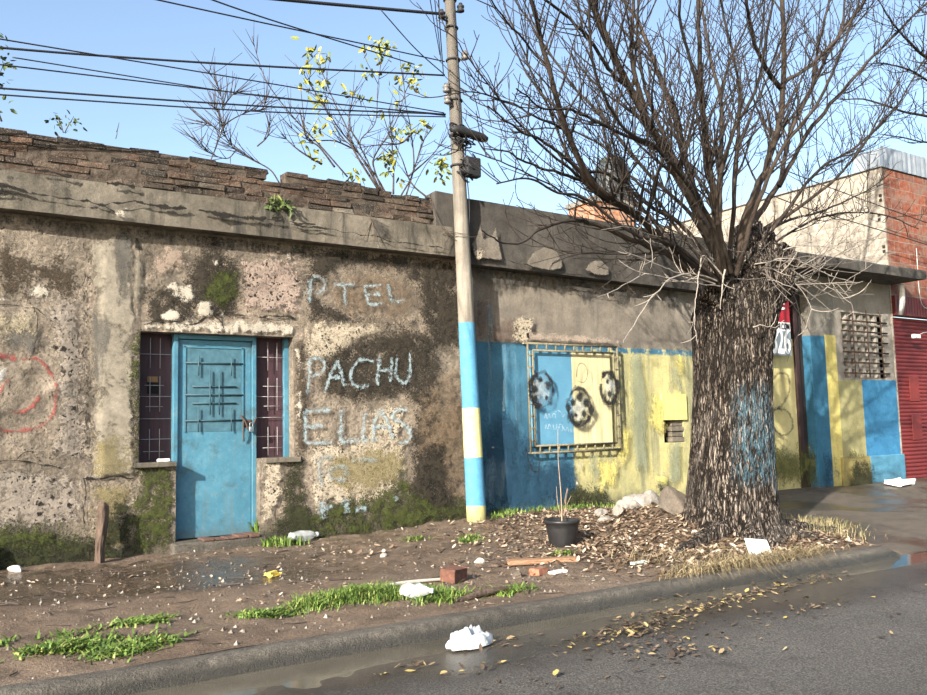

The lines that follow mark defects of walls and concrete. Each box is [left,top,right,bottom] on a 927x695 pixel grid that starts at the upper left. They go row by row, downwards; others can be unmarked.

crack [0,168,449,250]
flaking render [146,246,184,278]
flaking render [167,282,194,303]
leakage [115,228,279,330]
flaking render [161,310,180,321]
flaking render [477,300,517,341]
flaking render [529,332,618,343]
leakage [291,245,466,521]
crack [0,451,60,469]
leakage [0,489,137,570]